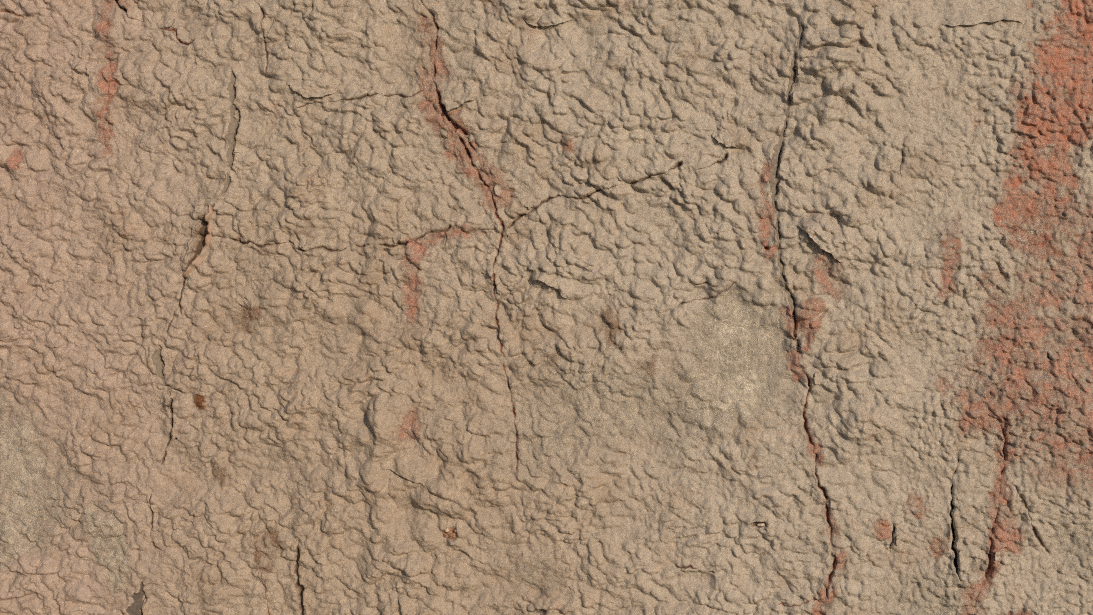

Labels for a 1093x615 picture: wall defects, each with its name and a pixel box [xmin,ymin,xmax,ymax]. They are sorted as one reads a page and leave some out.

crack [115,0,194,45]
crack [152,277,190,464]
crack [206,1,735,471]
crack [764,20,839,607]
peeling [935,0,1093,615]
crack [889,525,901,550]
crack [943,417,1050,613]